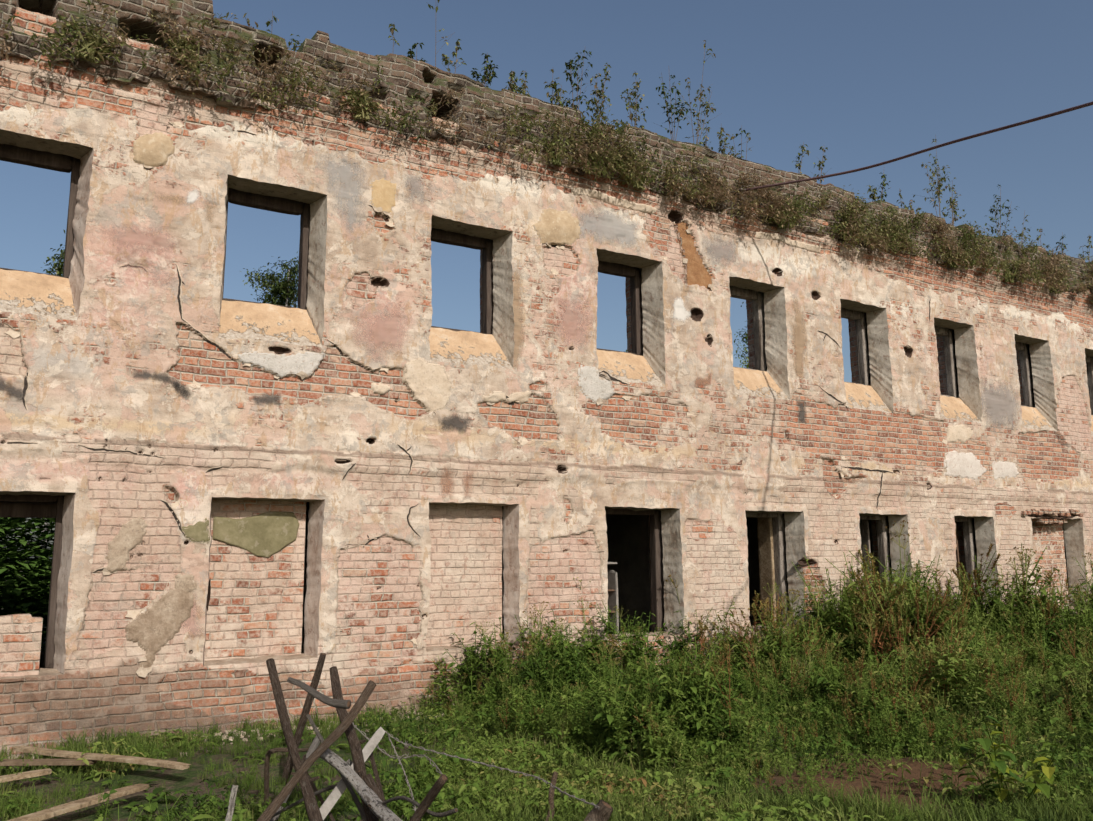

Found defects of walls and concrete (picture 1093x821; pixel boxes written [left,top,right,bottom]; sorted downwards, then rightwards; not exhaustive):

crack [119,263,148,272]
crack [176,264,238,363]
crack [20,371,30,410]
flaking render [164,321,452,420]
crack [398,443,413,473]
flaking render [578,366,697,446]
flaking render [778,375,1093,499]
crack [161,499,186,538]
crack [407,504,422,538]
flaking render [82,518,326,722]
flaking render [335,533,454,697]
flaking render [508,498,619,676]